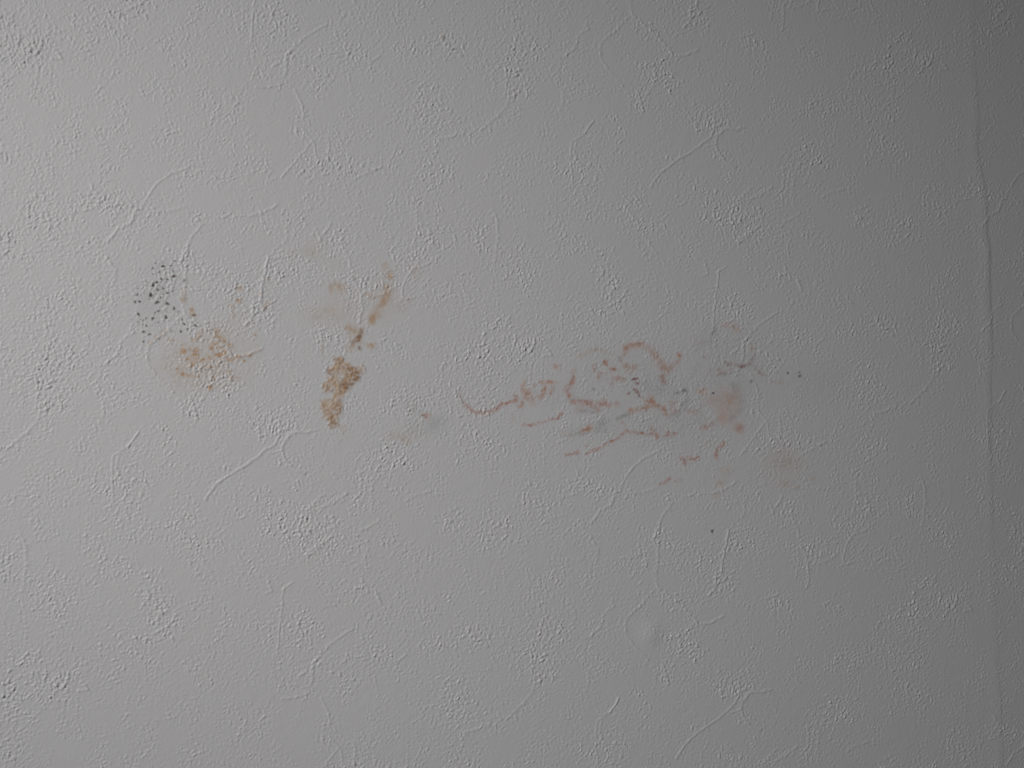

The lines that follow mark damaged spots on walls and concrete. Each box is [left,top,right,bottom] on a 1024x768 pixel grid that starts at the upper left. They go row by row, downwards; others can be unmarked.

water stain [131,255,198,343]
water stain [456,320,854,501]